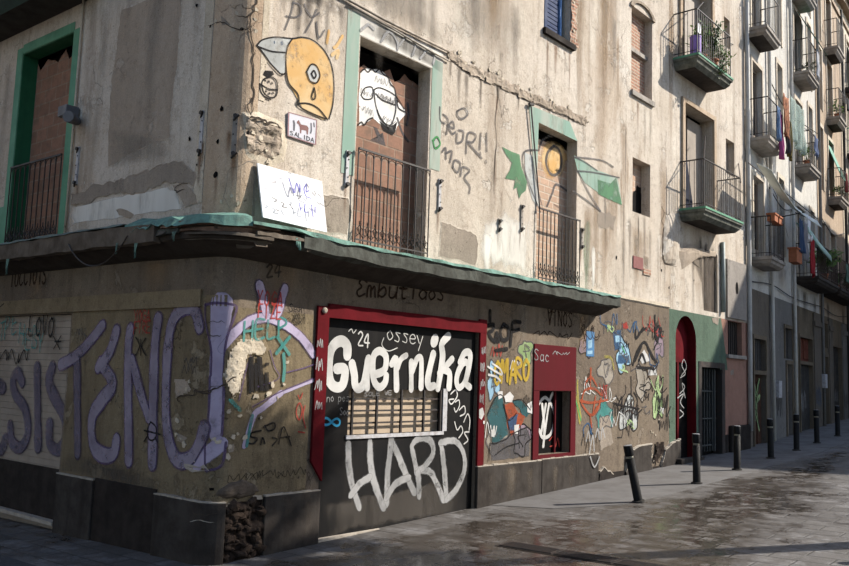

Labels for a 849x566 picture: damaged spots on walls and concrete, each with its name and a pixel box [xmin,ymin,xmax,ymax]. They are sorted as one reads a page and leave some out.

peeling [108,0,182,168]
crack [208,0,259,143]
peeling [71,161,197,208]
spalling [220,111,287,216]
spalling [222,335,269,399]